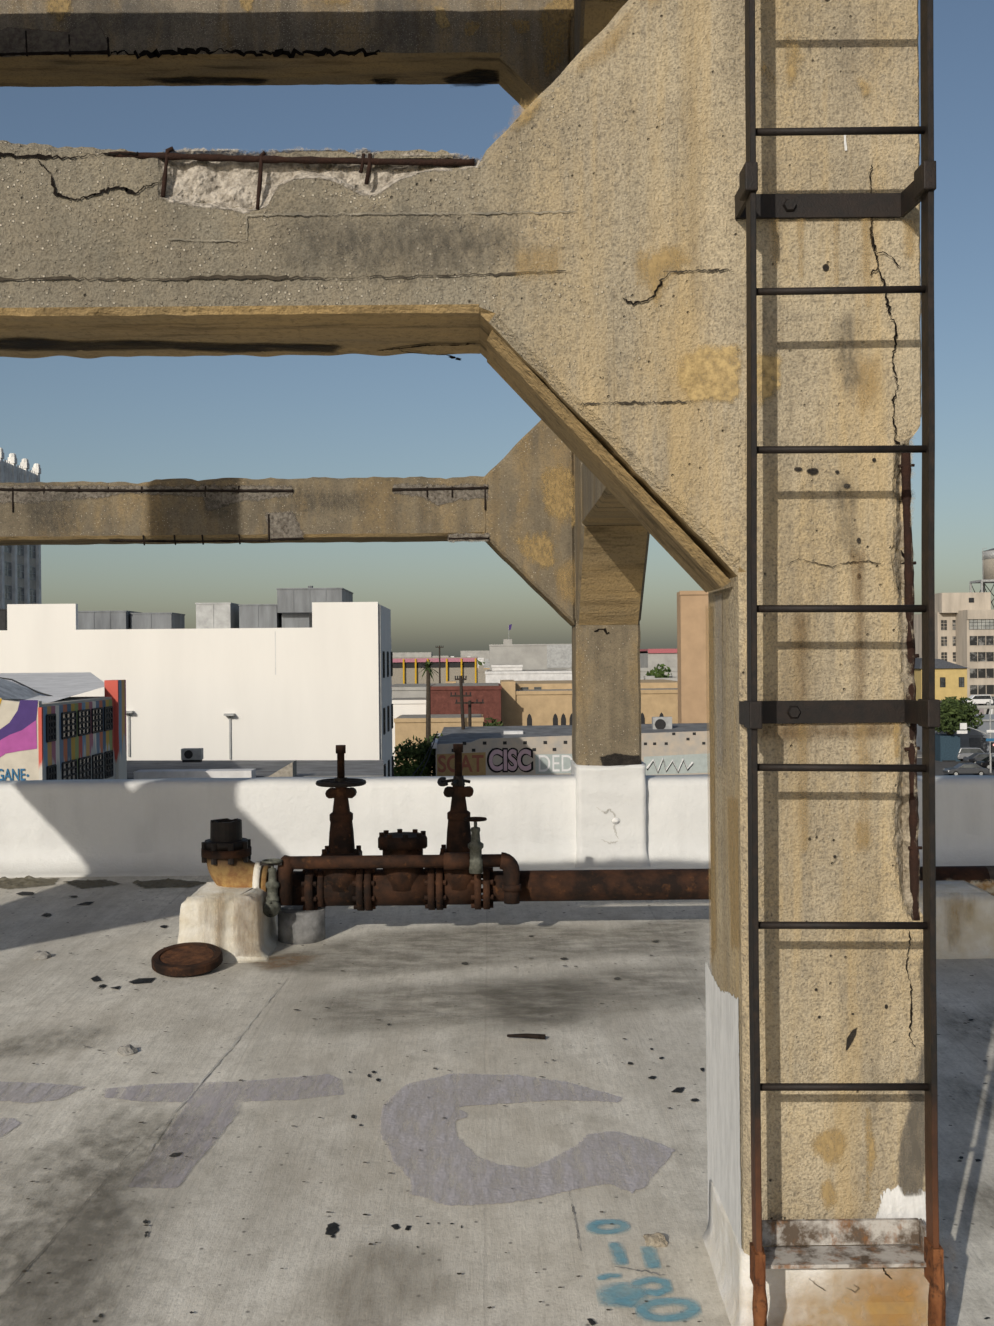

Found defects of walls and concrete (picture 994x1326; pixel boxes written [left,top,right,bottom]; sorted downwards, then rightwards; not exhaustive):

spalling [0,0,110,57]
crack [109,47,380,59]
peeling [512,0,574,74]
crack [0,152,158,202]
spalling [108,146,483,213]
crack [623,272,670,305]
crack [869,165,904,445]
corrosion [791,1274,928,1326]